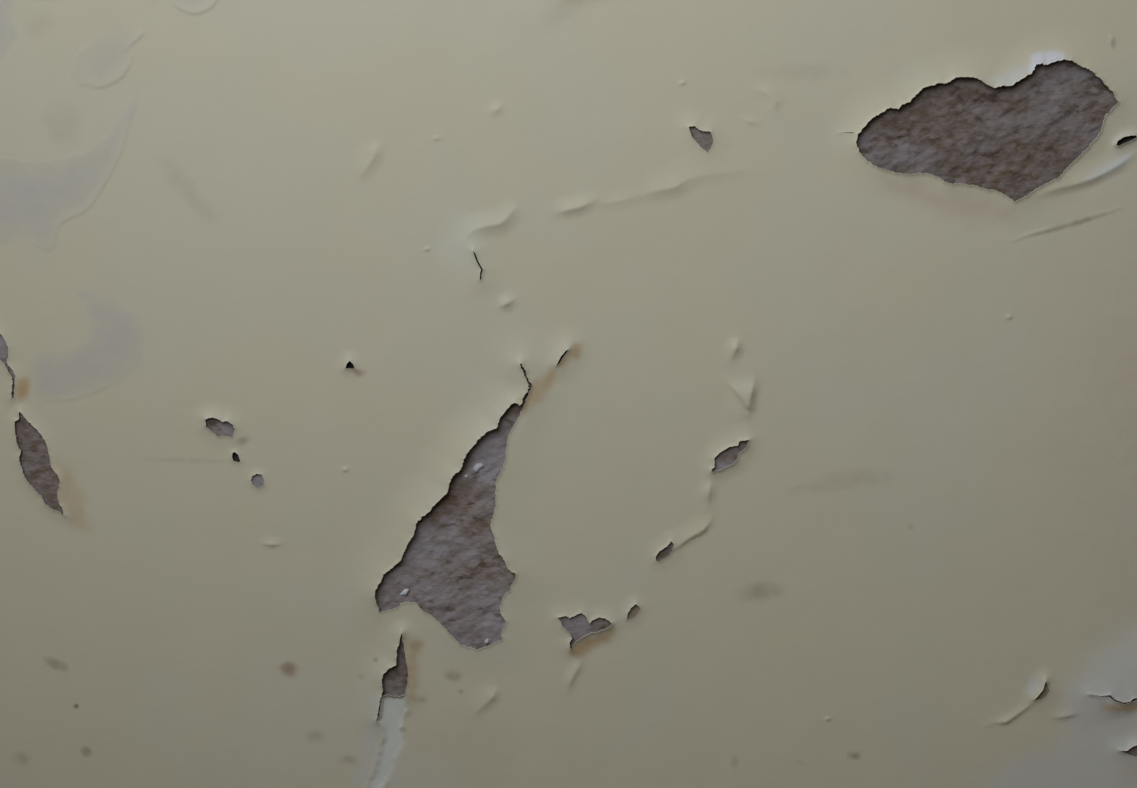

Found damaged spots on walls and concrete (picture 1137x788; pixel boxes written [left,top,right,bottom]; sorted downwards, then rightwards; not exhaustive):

peeling [683,121,718,157]
peeling [850,54,1137,207]
peeling [0,327,70,521]
flaking render [202,412,267,491]
peeling [707,435,754,477]
peeling [367,358,537,788]
peeling [650,535,679,567]
peeling [553,599,647,652]
peeling [1028,674,1055,706]